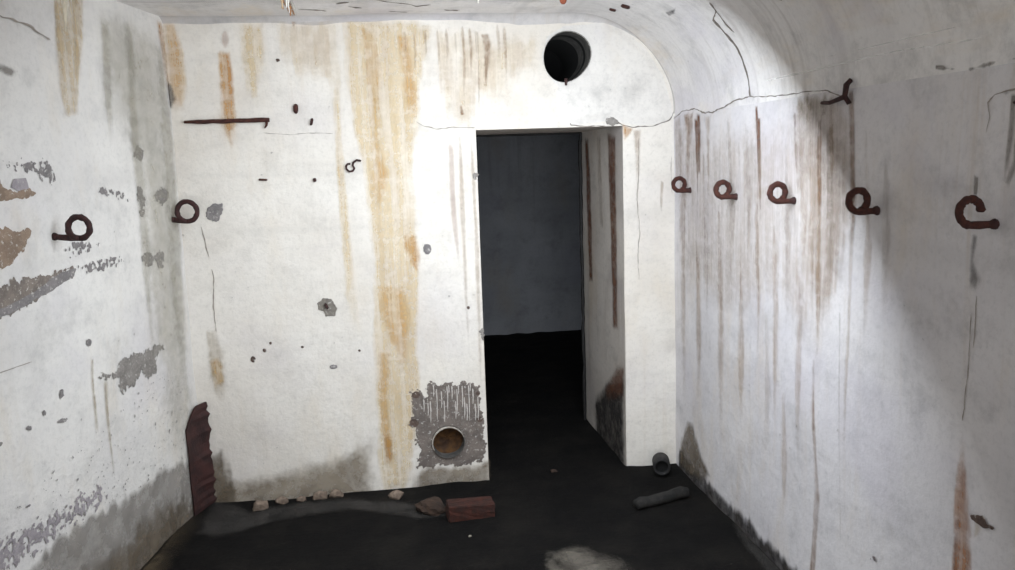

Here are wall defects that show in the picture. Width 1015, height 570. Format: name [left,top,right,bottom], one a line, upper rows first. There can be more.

crack [986,88,1015,131]
peeling [134,145,144,161]
peeling [99,186,169,217]
peeling [0,226,31,269]
peeling [0,241,122,320]
peeling [141,250,164,268]
peeling [409,381,487,469]
damp [35,464,194,570]
damp [213,454,366,503]
damp [679,425,792,570]
rust [953,540,969,570]